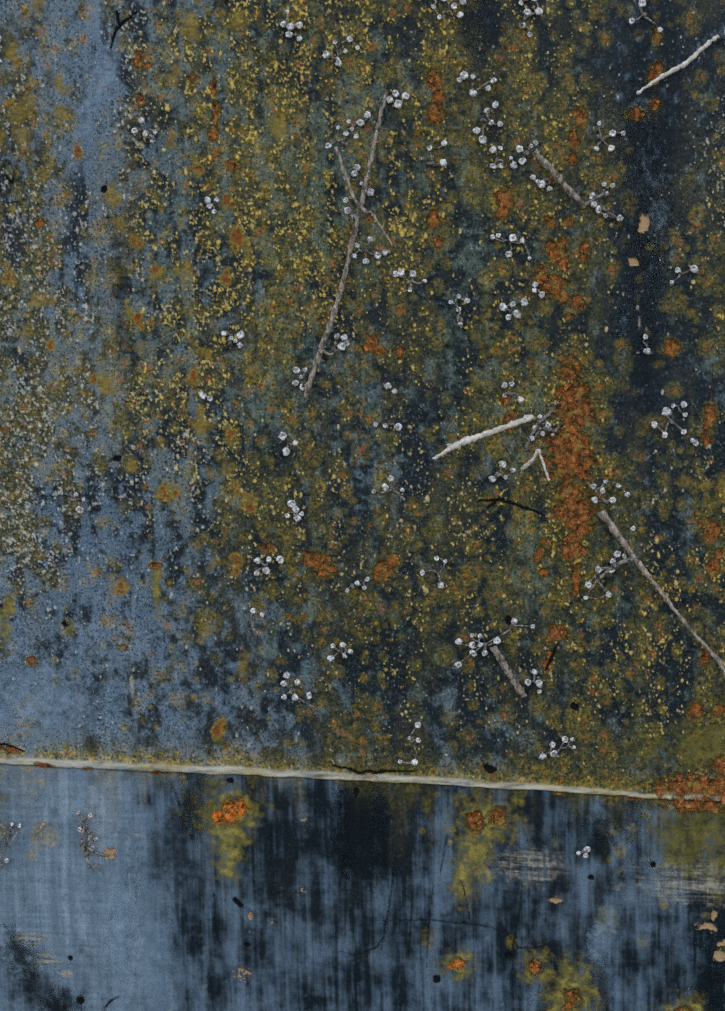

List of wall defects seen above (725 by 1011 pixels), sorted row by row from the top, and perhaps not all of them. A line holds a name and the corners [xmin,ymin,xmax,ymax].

corrosion [533,354,597,596]
corrosion [303,550,339,579]
corrosion [373,553,400,584]
corrosion [206,782,258,878]
corrosion [453,796,518,898]
corrosion [628,703,725,894]
corrosion [526,953,598,1011]